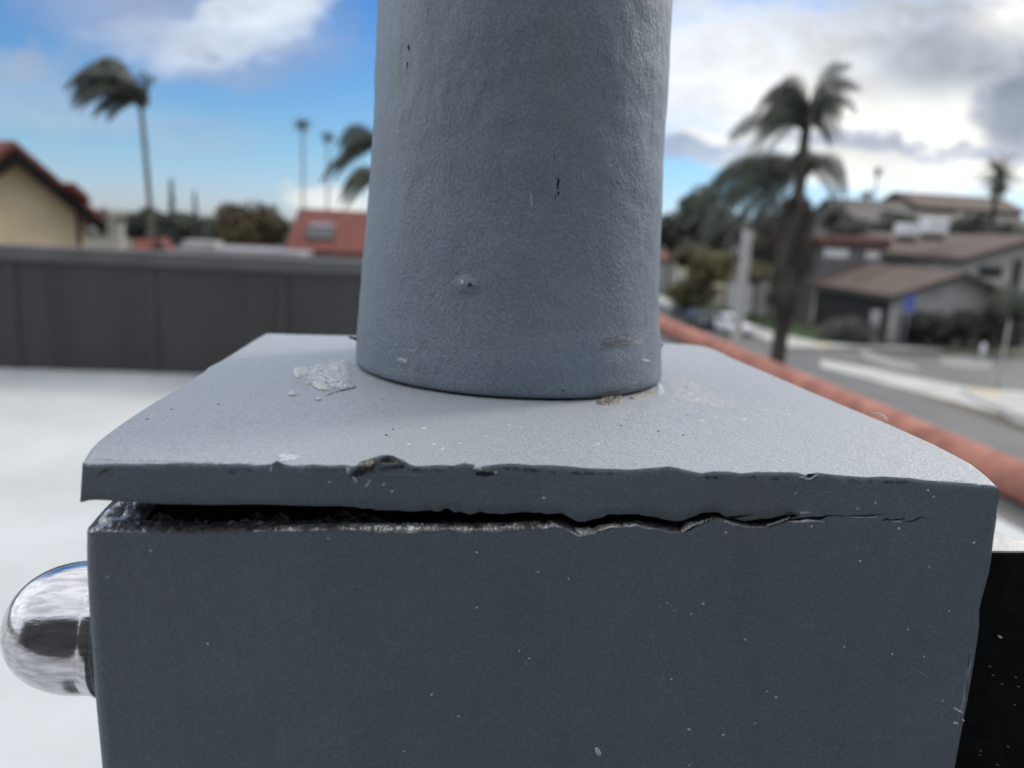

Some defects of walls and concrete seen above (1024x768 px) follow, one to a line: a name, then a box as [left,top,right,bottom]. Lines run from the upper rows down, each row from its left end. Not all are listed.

peeling [288,358,357,400]
peeling [346,455,417,492]
crack [86,502,923,536]